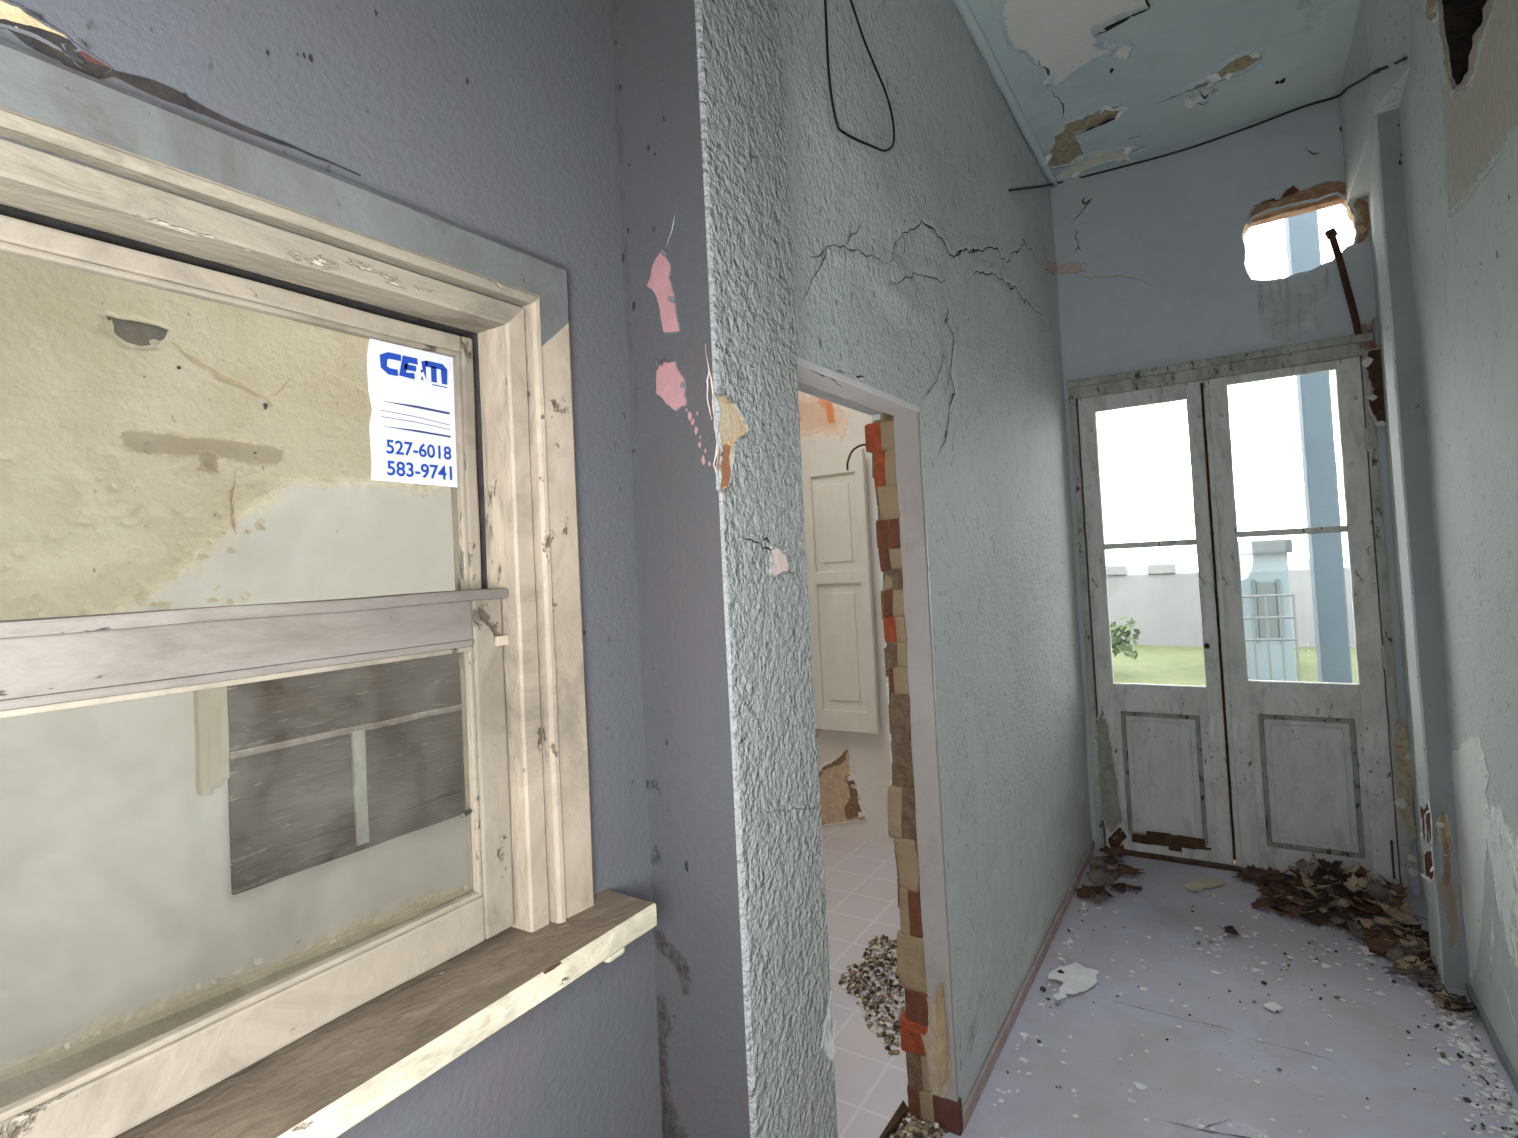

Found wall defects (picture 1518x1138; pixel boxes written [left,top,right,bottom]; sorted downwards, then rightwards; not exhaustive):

peeling [0,0,114,73]
peeling [994,0,1154,94]
flaking render [1042,102,1136,181]
flaking render [1422,0,1518,214]
flaking render [1243,179,1370,246]
flaking render [97,311,172,351]
peeling [647,249,681,334]
crack [802,60,1116,466]
flaking render [654,359,750,493]
peeling [768,545,792,579]
flaking render [818,745,869,828]
flaking render [865,413,934,1124]